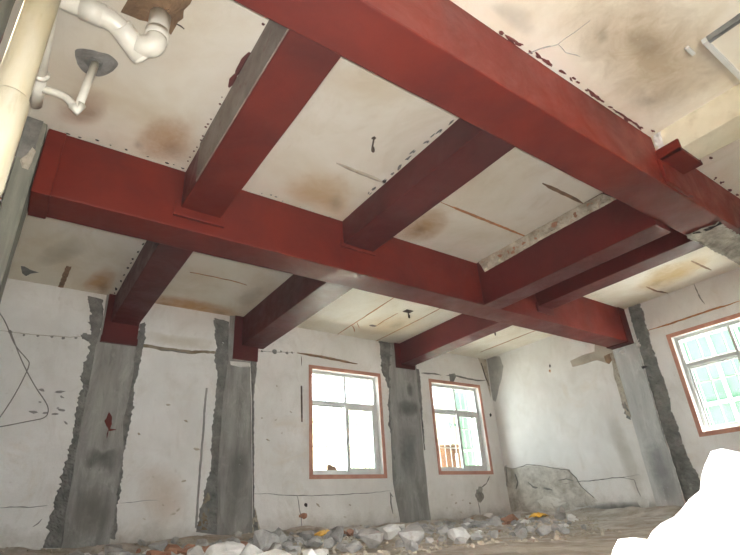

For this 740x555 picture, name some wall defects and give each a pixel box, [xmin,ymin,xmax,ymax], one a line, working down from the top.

spalling [43,296,104,548]
spalling [110,322,146,540]